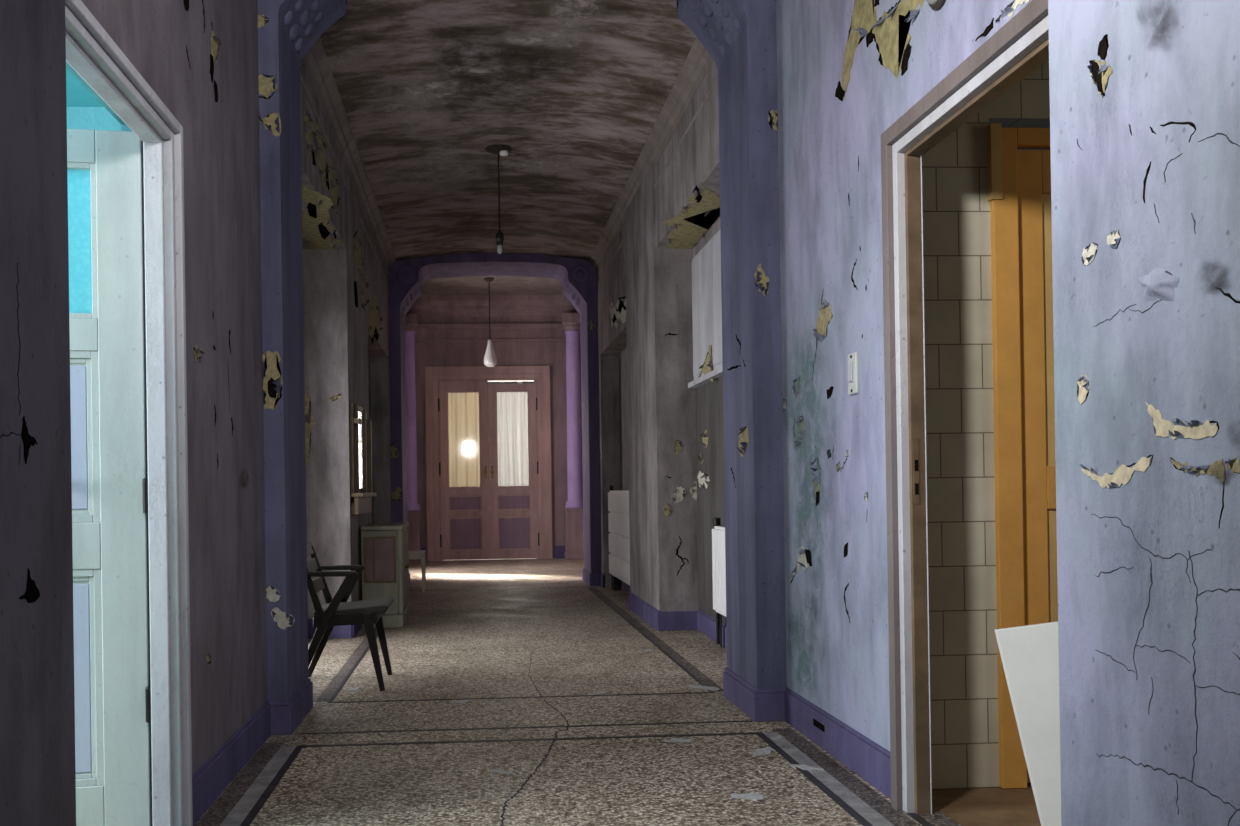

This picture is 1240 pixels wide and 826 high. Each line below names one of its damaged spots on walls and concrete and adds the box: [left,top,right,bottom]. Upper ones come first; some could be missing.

peeling [835,0,924,101]
spalling [975,0,1030,41]
spalling [1087,34,1113,98]
crack [1129,121,1240,222]
peeling [662,182,720,249]
crack [1219,288,1240,304]
crack [14,263,22,415]
peeling [1145,401,1219,439]
peeling [1080,455,1153,488]
crack [676,536,689,576]
crack [1091,514,1240,825]
crack [500,653,569,826]